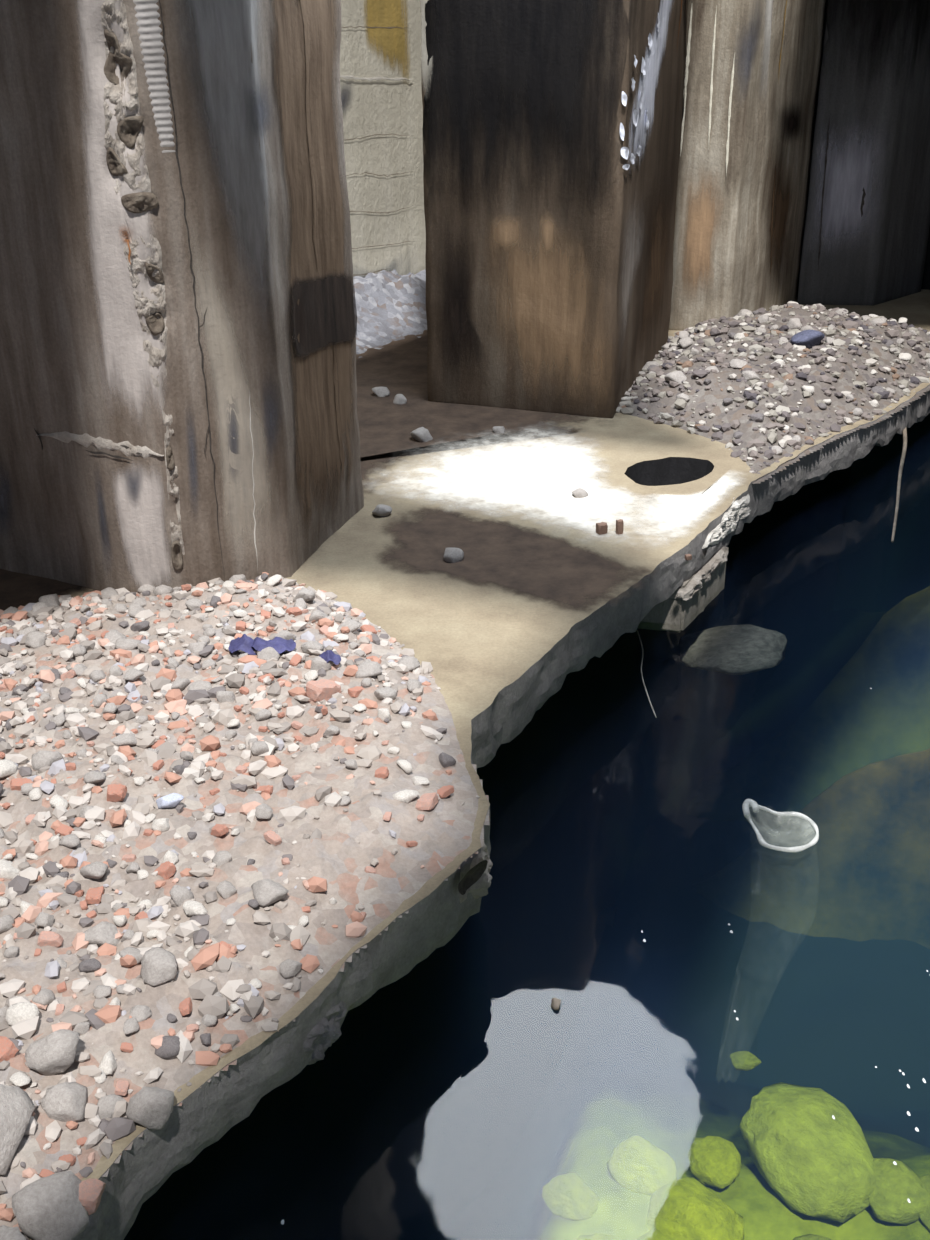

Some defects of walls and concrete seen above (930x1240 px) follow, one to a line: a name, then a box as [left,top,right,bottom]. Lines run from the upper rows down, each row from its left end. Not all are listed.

spalling [101,0,159,213]
peeling [620,0,672,170]
spalling [124,234,185,571]
crack [159,0,224,569]